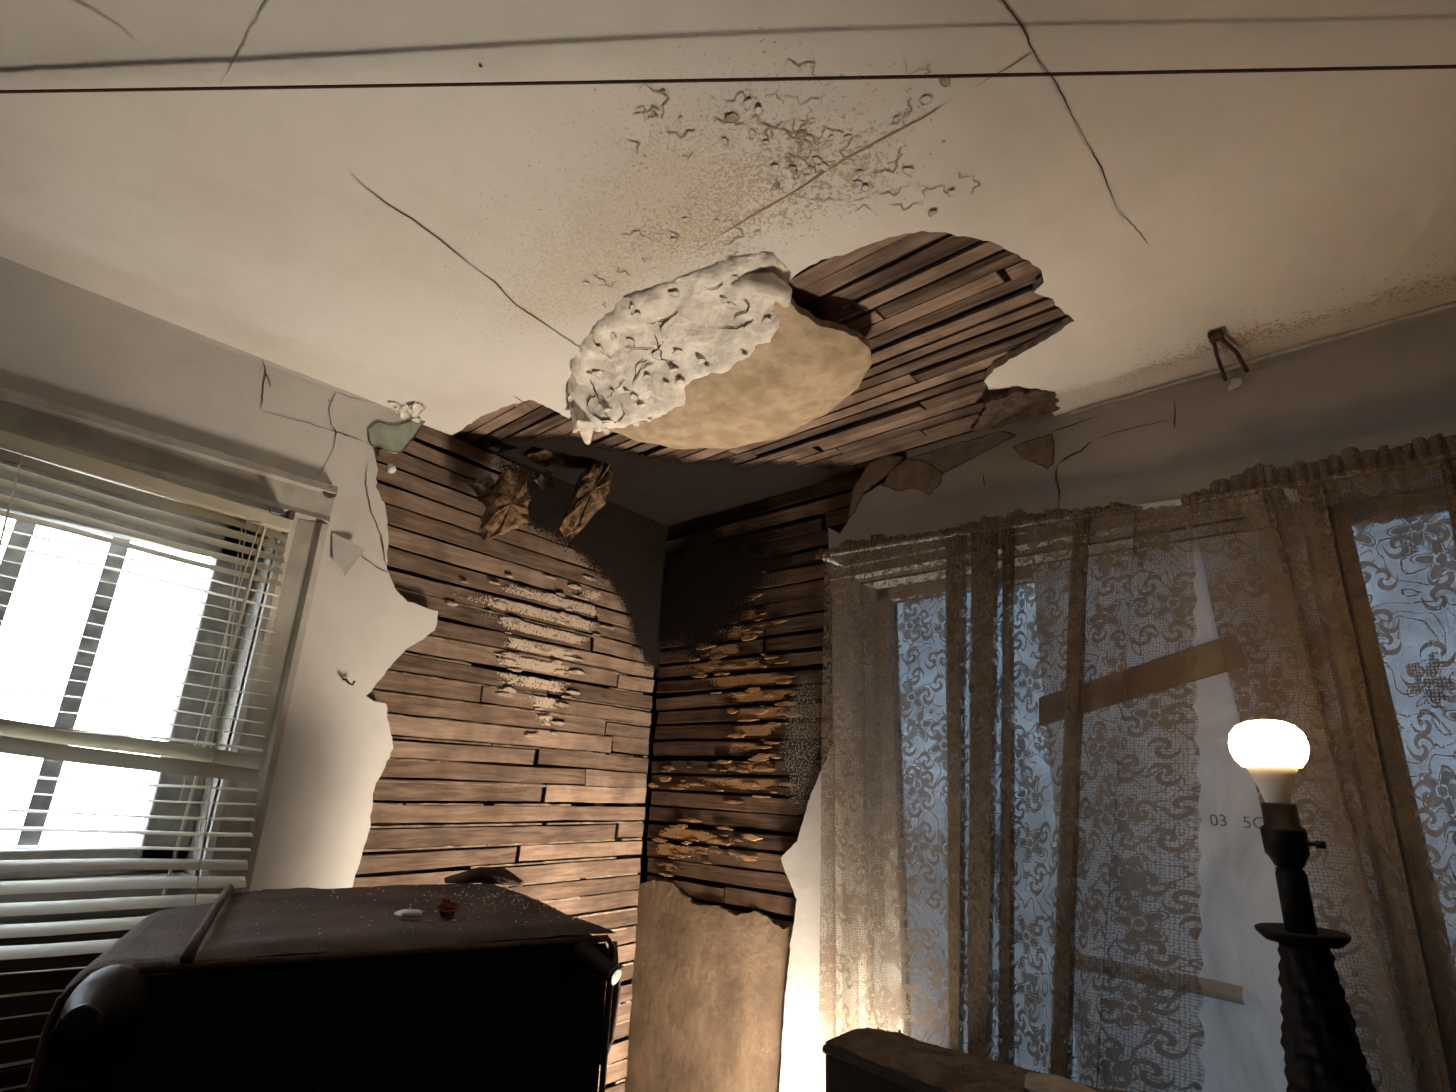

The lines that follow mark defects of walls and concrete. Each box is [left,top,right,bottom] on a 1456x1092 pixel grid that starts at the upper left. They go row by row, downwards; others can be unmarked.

crack [198,0,269,92]
crack [349,173,581,348]
damp [448,41,925,347]
crack [696,0,1148,251]
damp [1087,261,1456,397]
spalling [353,58,1067,1092]